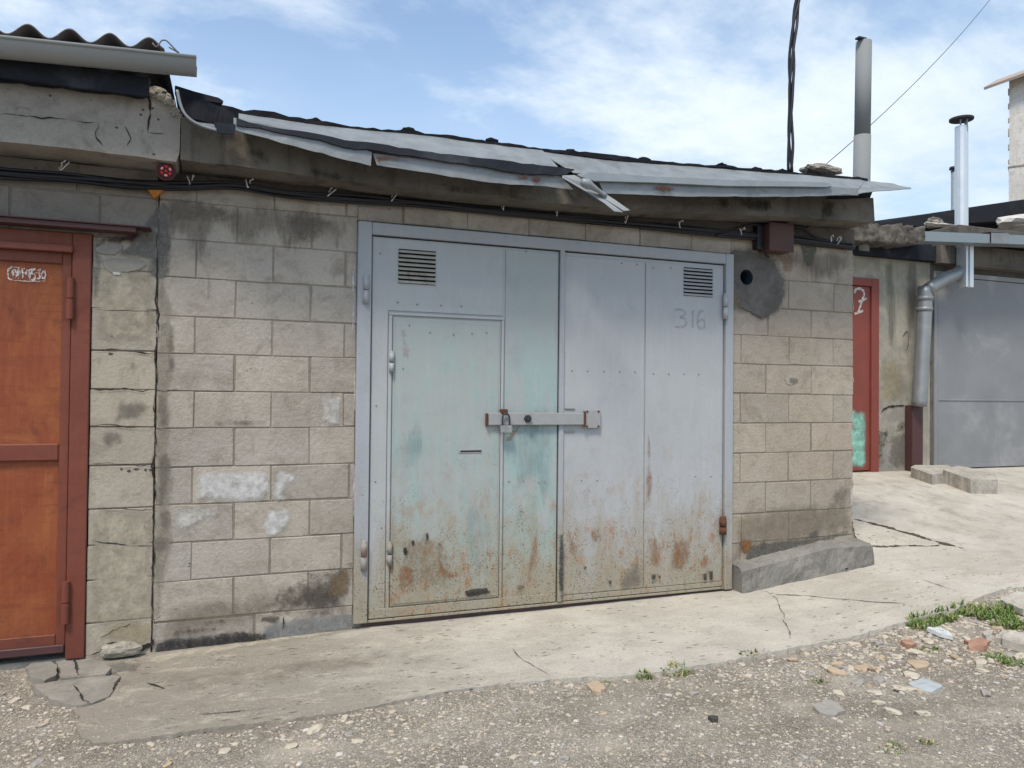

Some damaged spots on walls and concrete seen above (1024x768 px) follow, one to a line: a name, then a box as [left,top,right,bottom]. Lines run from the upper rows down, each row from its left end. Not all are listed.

crack [4,95,164,146]
crack [72,201,177,702]
leakage [199,471,294,535]
corrosion [400,533,453,584]
crack [856,519,962,548]
leakage [262,571,340,622]
corrosion [465,588,490,597]
crack [766,591,906,635]